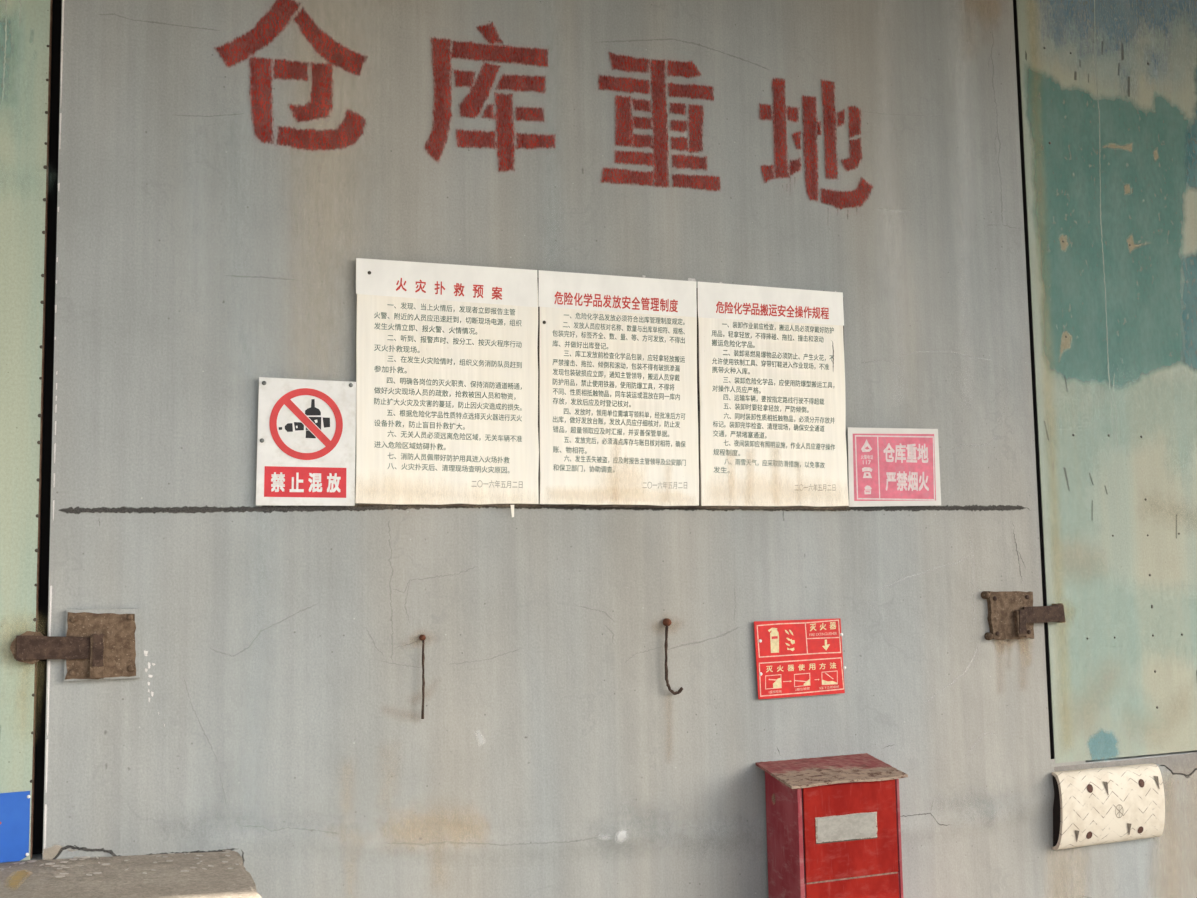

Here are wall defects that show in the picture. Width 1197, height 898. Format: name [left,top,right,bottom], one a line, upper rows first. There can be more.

peeling [1027,68,1197,387]